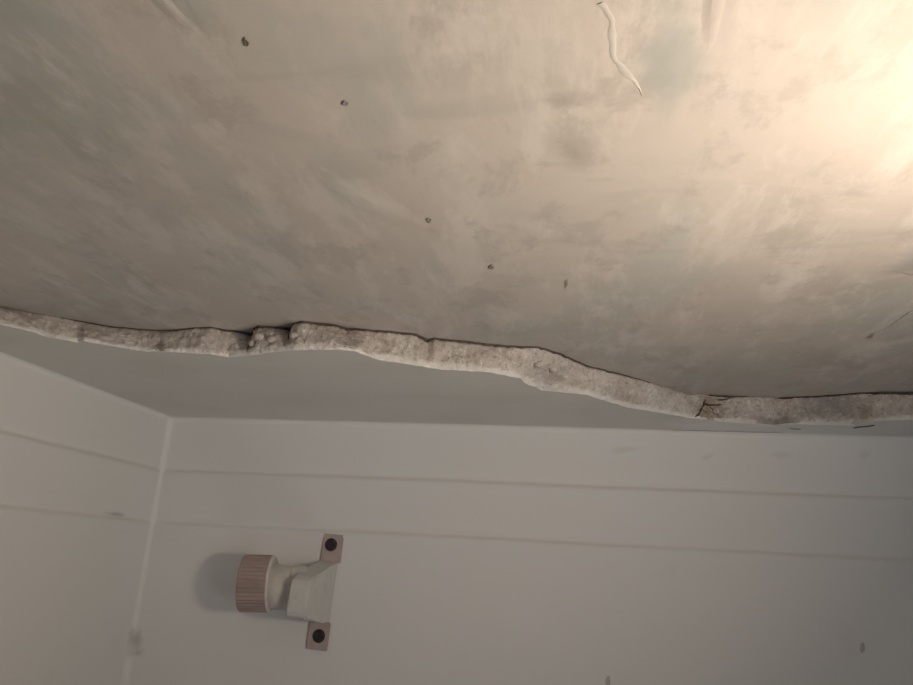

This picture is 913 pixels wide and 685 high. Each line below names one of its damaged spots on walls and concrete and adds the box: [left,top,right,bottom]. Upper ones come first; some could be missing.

flaking render [0,307,913,436]